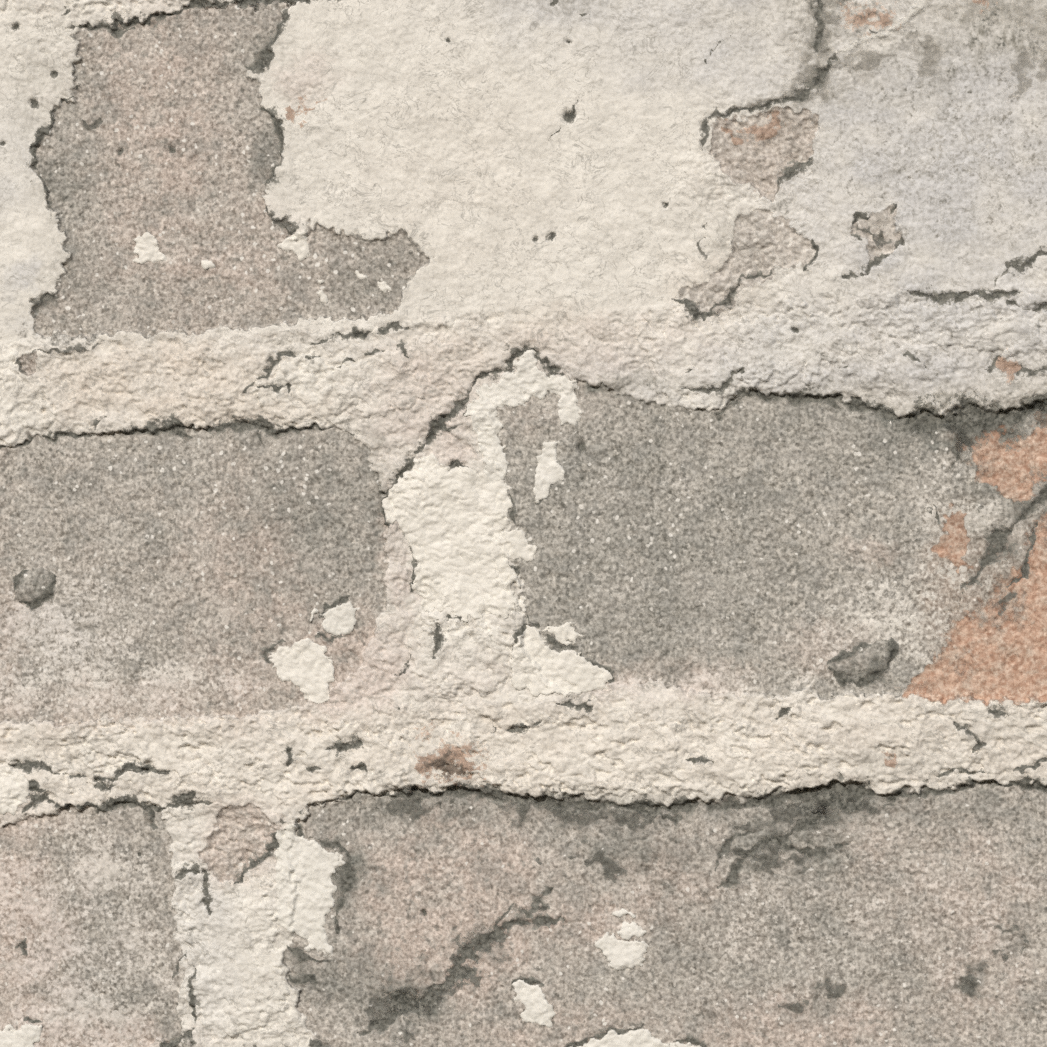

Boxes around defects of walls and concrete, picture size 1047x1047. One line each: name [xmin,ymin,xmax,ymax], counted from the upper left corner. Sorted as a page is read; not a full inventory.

peeling [15,0,430,376]
spalling [671,106,819,321]
crack [379,344,575,528]
crack [681,355,1047,612]
crack [903,350,926,368]
spalling [962,409,1047,503]
peeling [258,595,357,704]
spalling [902,514,1047,706]
peeling [198,803,364,986]
peeling [510,976,556,1028]
peeling [595,908,651,971]
peeling [564,1023,707,1047]